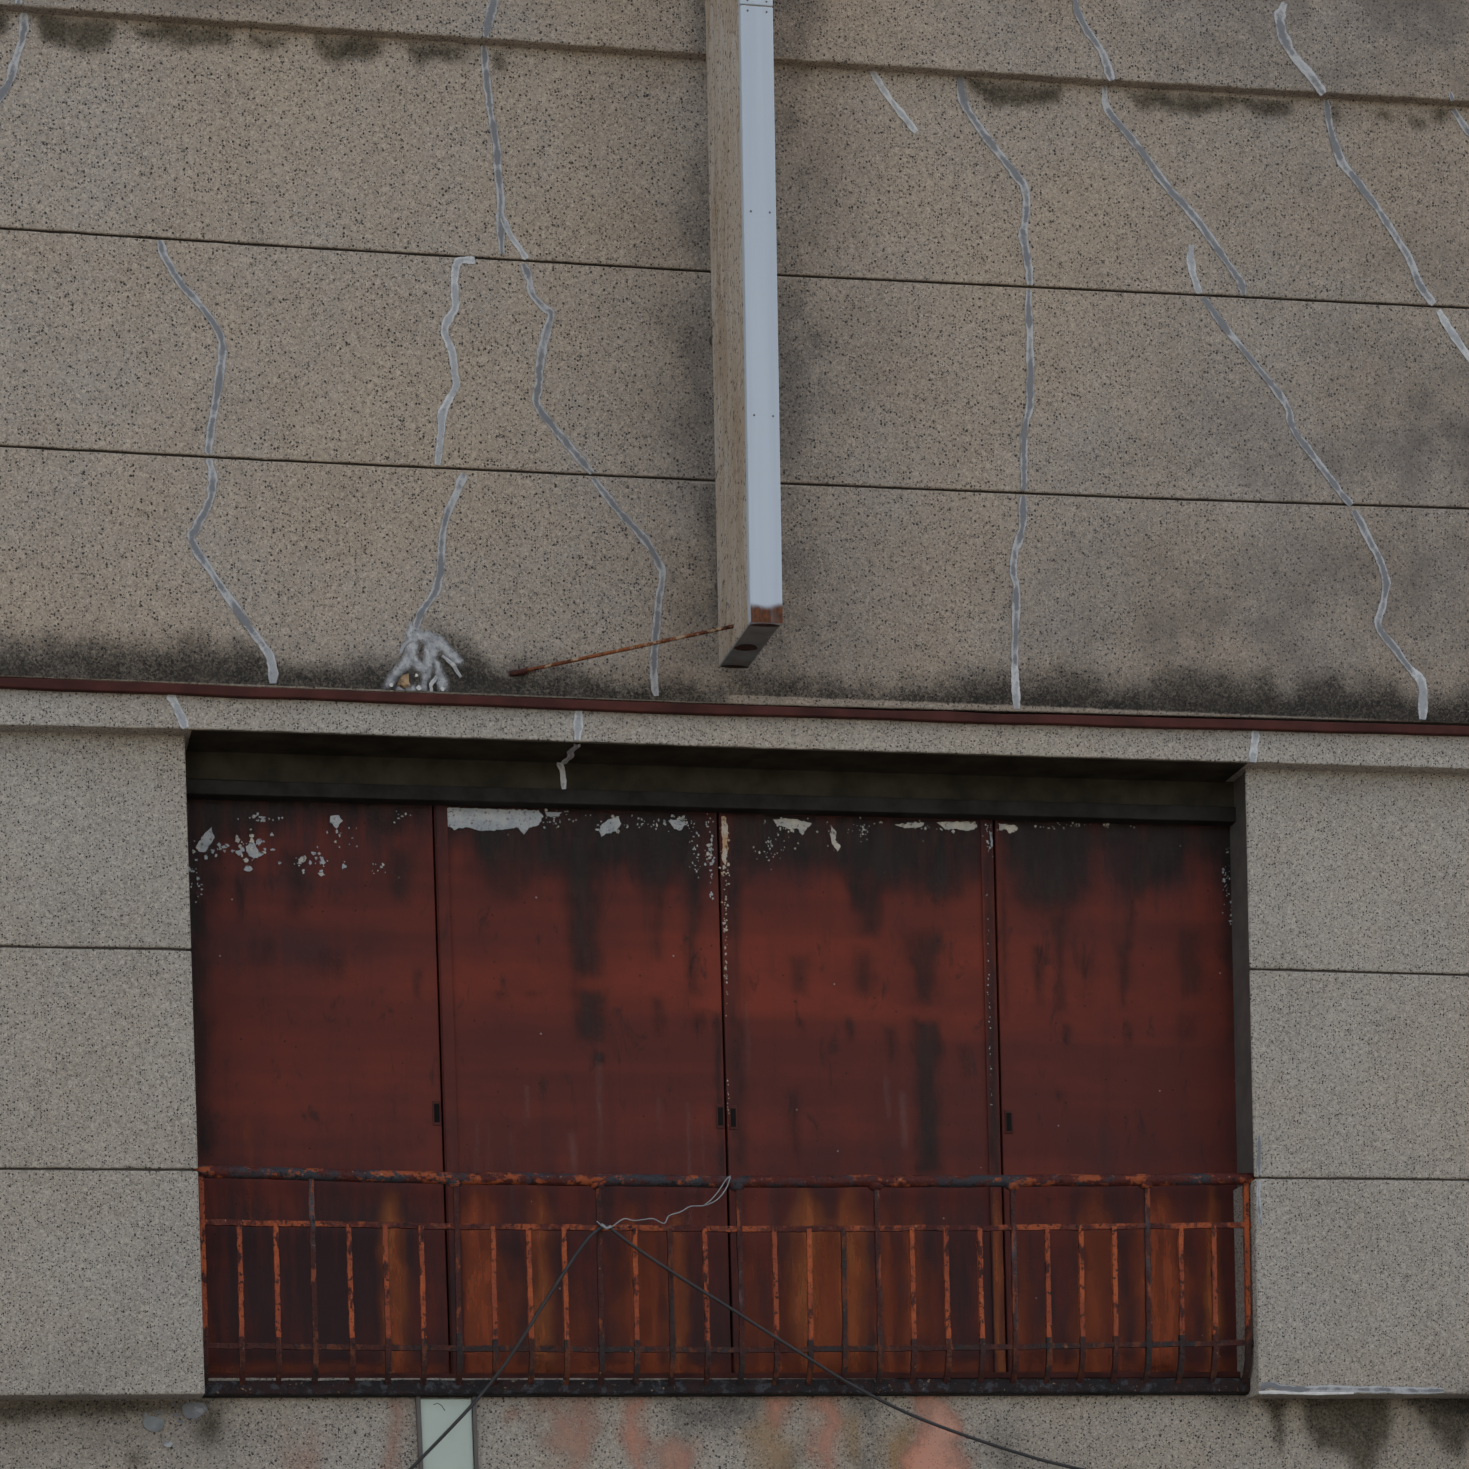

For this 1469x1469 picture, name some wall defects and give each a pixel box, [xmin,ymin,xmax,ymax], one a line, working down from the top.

water stain [40,17,114,50]
water stain [318,40,378,61]
crack [1274,2,1469,362]
crack [405,0,666,696]
crack [1073,0,1428,720]
water stain [0,640,706,702]
peeling [189,813,357,903]
peeling [447,807,730,995]
peeling [753,817,1085,861]
corrosion [761,1197,865,1373]
corrosion [1136,1199,1221,1372]
corrosion [892,1396,968,1469]